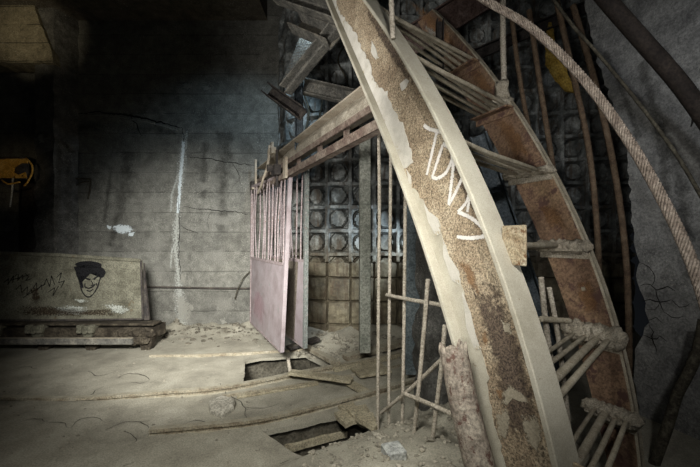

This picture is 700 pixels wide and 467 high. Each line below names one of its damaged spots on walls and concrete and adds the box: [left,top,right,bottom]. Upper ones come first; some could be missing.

rust [365,8,413,84]
crack [79,111,254,182]
leakage [169,131,188,325]
peeling [332,0,528,467]
crack [638,262,689,352]
spalling [244,358,320,381]
rust [461,264,536,442]
spalling [268,420,368,456]